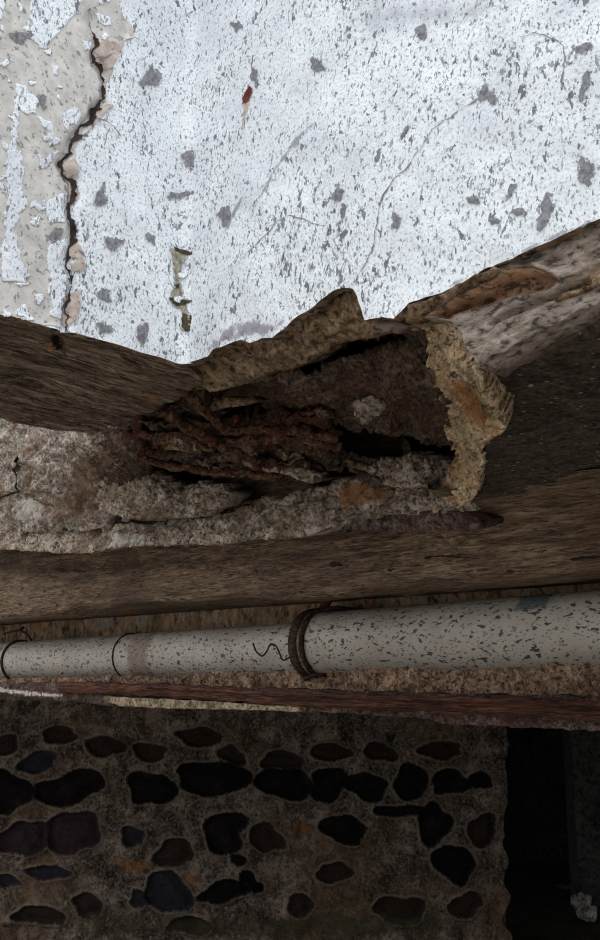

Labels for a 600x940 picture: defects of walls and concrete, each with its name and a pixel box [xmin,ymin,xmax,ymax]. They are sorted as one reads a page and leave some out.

peeling [0,0,135,352]
crack [53,22,143,350]
corrosion [242,86,252,125]
spalling [0,223,600,554]